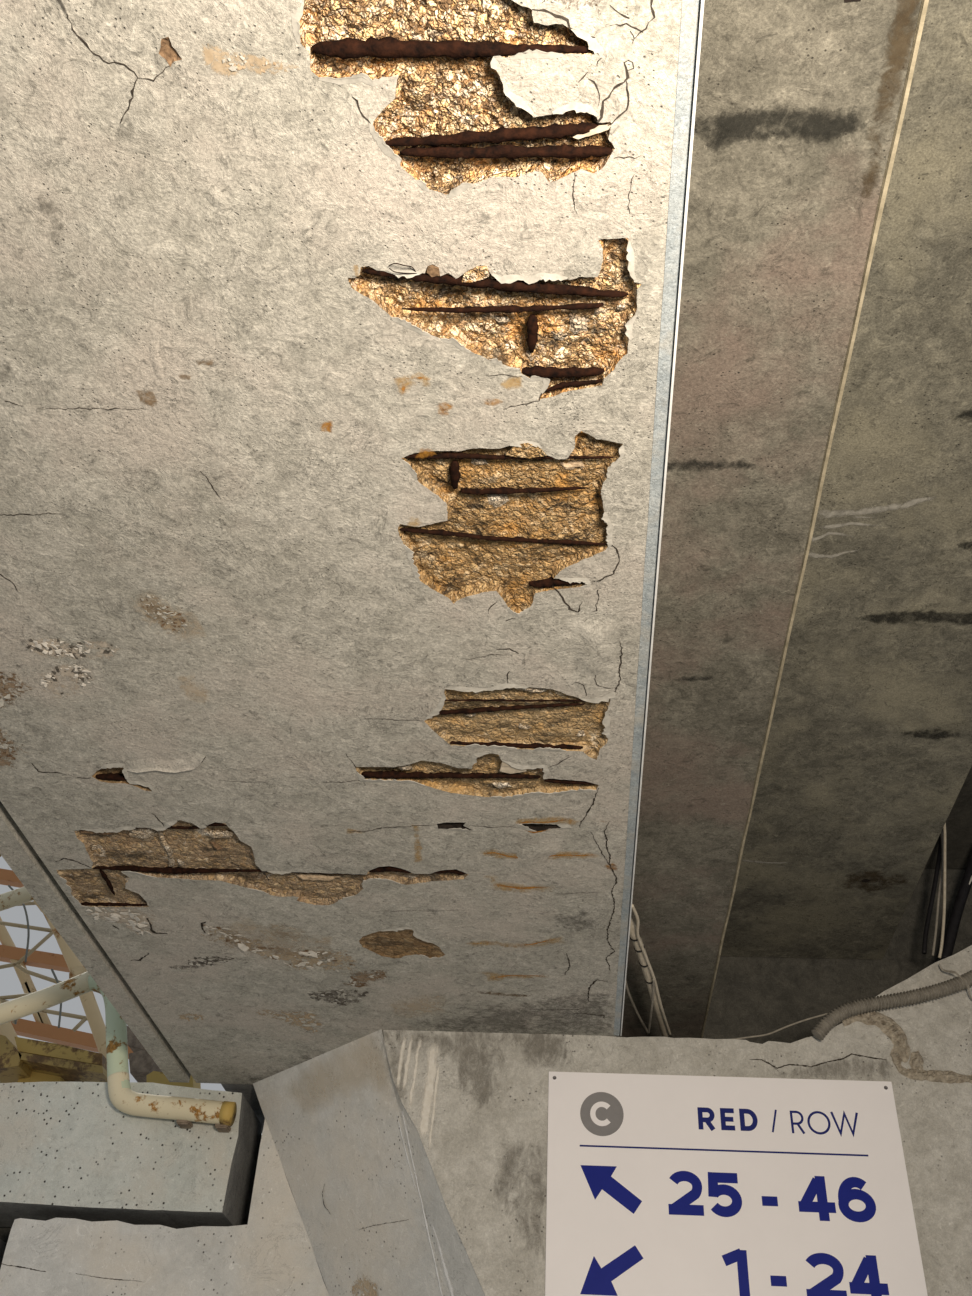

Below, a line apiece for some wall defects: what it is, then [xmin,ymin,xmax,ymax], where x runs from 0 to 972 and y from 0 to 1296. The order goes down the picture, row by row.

crack [57,0,169,124]
spalling [291,0,615,198]
crack [532,0,655,125]
spalling [348,238,641,400]
spalling [398,431,625,617]
spalling [355,683,616,799]
spalling [57,820,471,935]
spalling [168,924,445,1033]
crack [749,1053,886,1071]